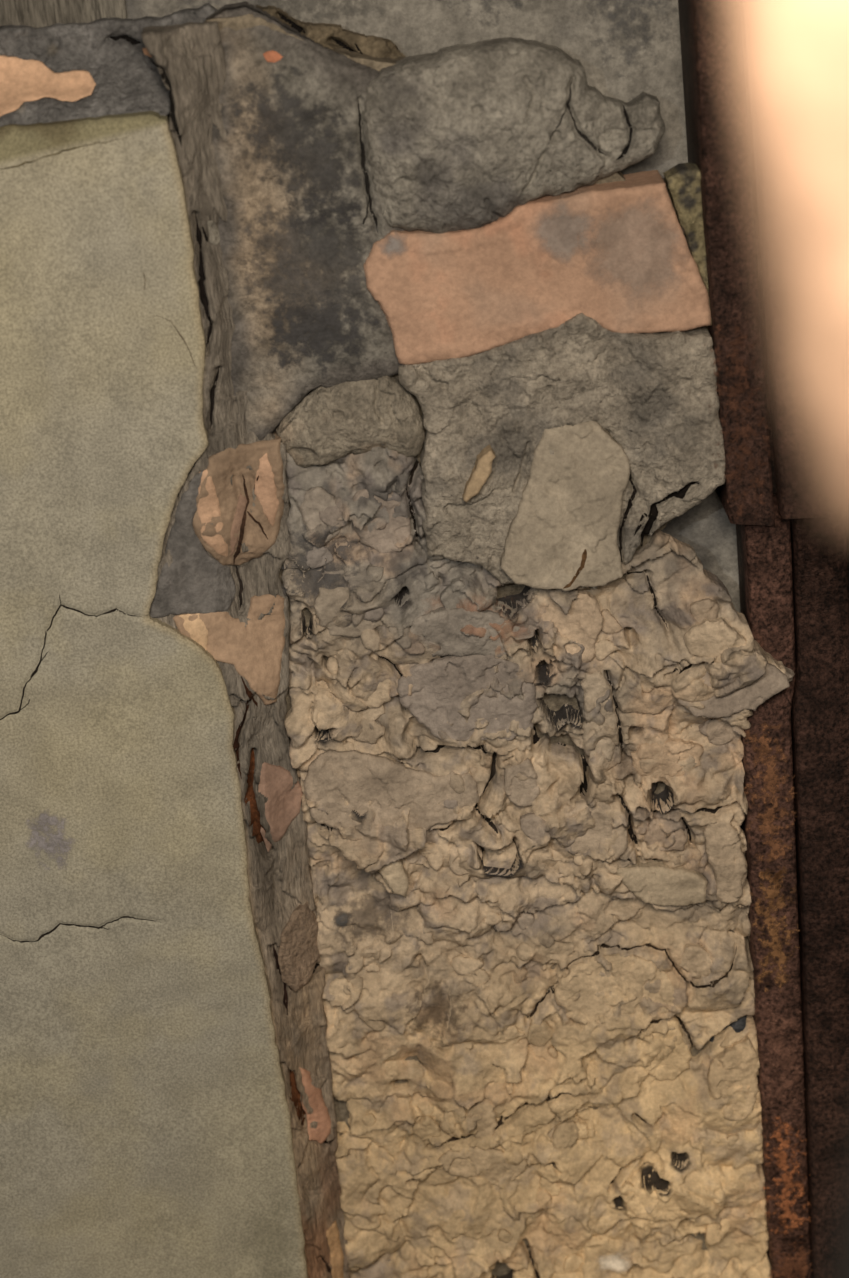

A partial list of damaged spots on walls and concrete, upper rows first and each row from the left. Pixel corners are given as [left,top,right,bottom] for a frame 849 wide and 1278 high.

crack [0,595,150,720]
spalling [141,21,795,1278]
crack [0,916,154,943]
crack [527,943,737,1018]
rust [745,724,809,1233]
crack [640,1015,747,1047]
crack [447,1093,572,1142]
crack [526,1244,540,1278]